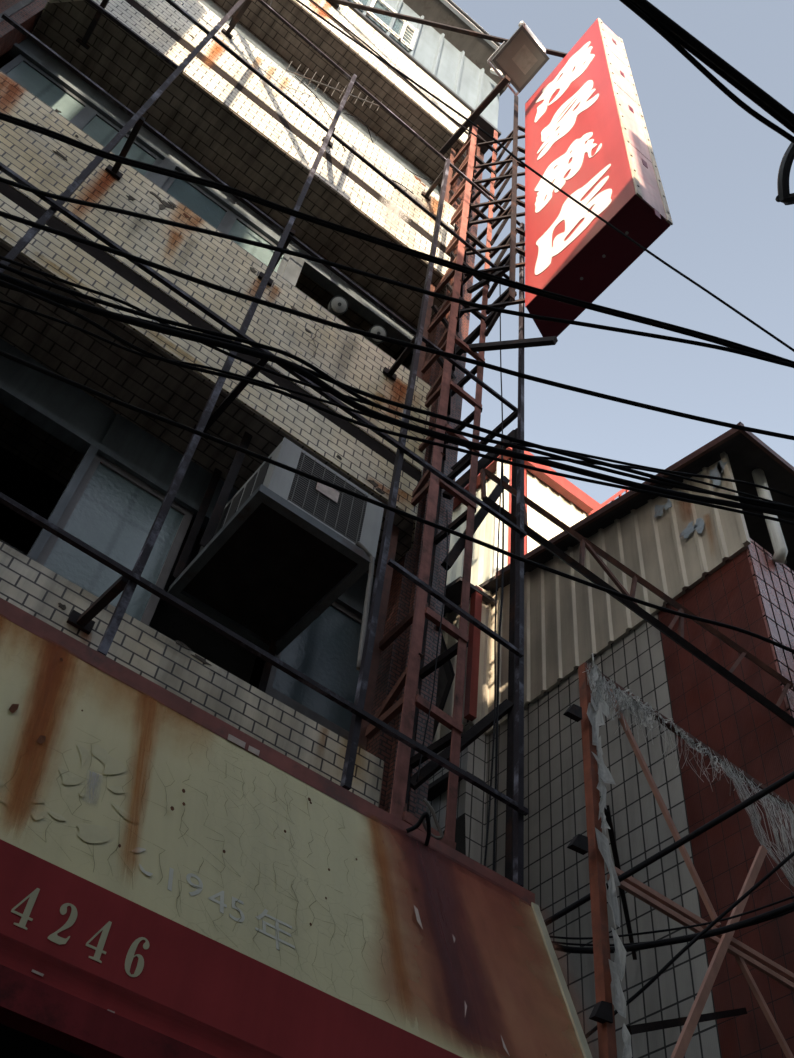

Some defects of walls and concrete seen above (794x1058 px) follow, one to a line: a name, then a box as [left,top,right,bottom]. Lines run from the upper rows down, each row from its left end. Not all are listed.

rust [9,646,77,816]
rust [125,693,156,863]
crack [4,732,396,1021]
rust [372,817,584,1058]